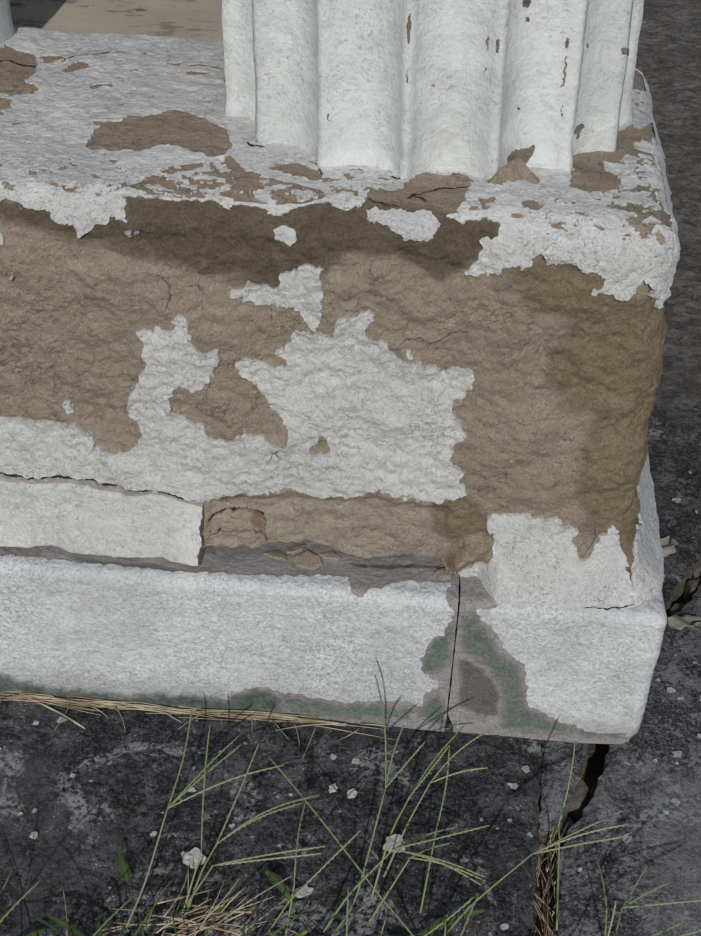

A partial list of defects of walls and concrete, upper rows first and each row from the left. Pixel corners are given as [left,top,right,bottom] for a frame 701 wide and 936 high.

peeling [0,45,89,115]
peeling [569,70,673,245]
peeling [624,280,656,303]
peeling [0,110,628,744]
crack [0,472,189,502]
crack [208,507,264,532]
leakage [461,661,498,714]